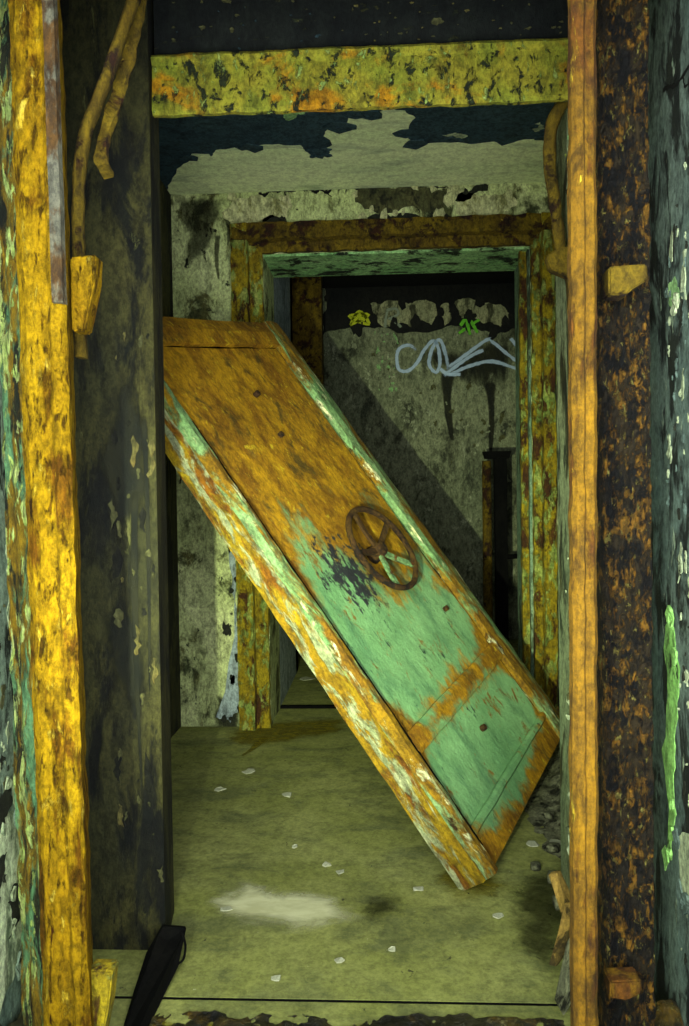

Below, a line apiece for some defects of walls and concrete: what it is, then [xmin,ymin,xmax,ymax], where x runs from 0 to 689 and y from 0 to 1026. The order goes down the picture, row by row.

peeling [167,109,545,224]
peeling [323,283,515,392]
water stain [441,345,508,451]
peeling [664,224,689,344]
peeling [666,413,689,483]
peeling [668,345,689,402]
peeling [666,491,689,520]
peeling [662,542,689,923]
peeling [0,668,22,1012]